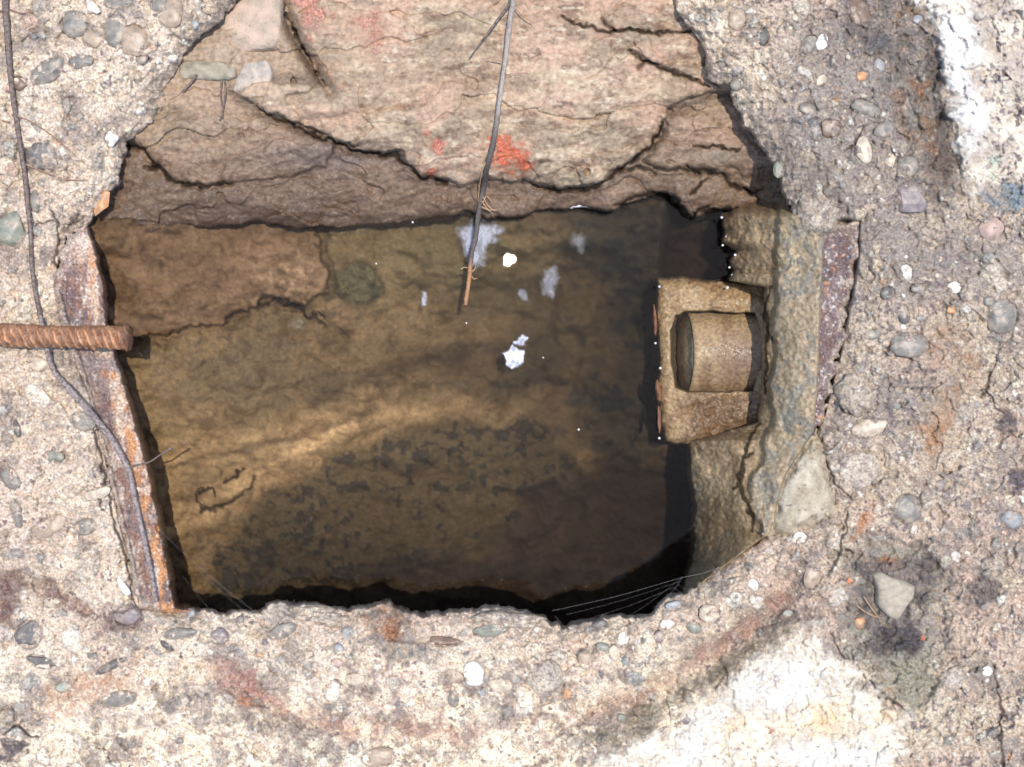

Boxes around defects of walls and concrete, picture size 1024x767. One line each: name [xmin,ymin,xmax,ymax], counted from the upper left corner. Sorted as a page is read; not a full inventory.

spalling [233,60,274,93]
crack [283,12,318,76]
crack [562,16,705,86]
crack [127,143,231,189]
crack [257,106,447,184]
crack [522,121,757,219]
peeling [503,335,528,369]